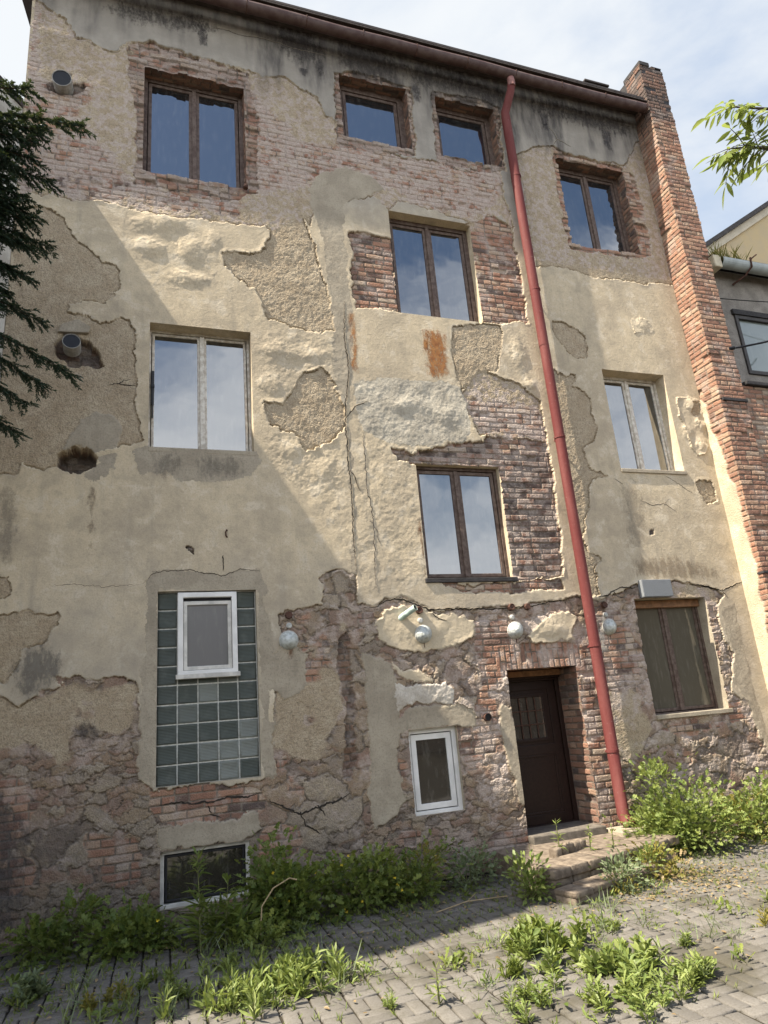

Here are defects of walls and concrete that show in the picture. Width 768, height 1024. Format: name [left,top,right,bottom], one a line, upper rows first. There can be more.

leakage [409,63,504,106]
leakage [531,99,629,149]
flaking render [516,141,672,288]
corrosion [423,331,448,377]
flaking render [0,0,622,957]
crack [343,304,573,621]
flaking render [553,367,768,836]
crack [158,793,350,834]